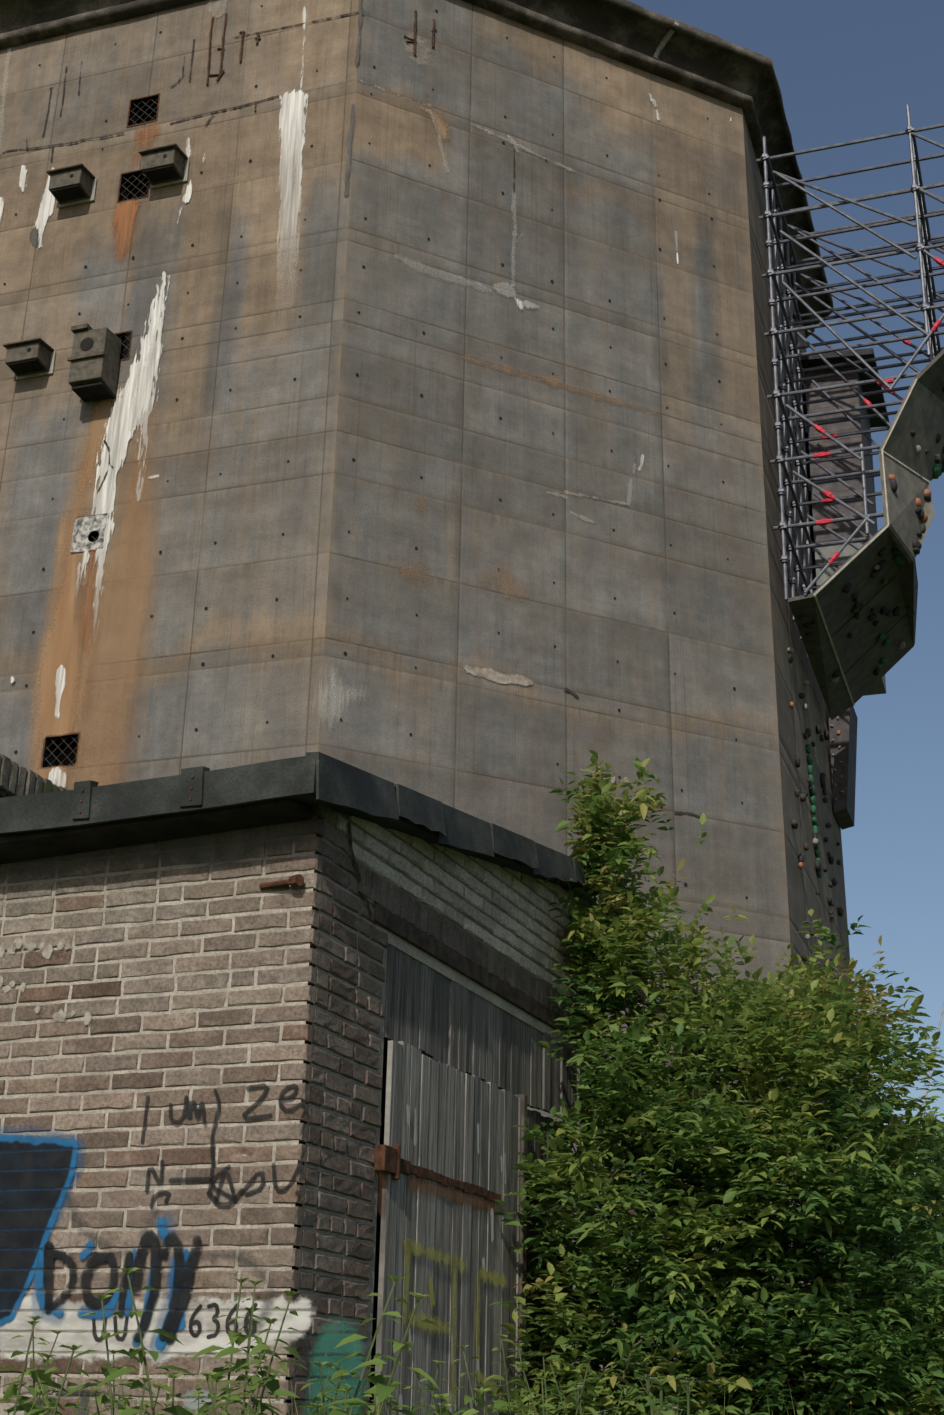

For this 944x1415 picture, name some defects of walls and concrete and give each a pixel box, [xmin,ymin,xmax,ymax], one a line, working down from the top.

damp [279,6,308,206]
corrosion [113,200,139,259]
damp [82,271,170,580]
corrosion [32,394,117,789]
damp [48,767,66,788]